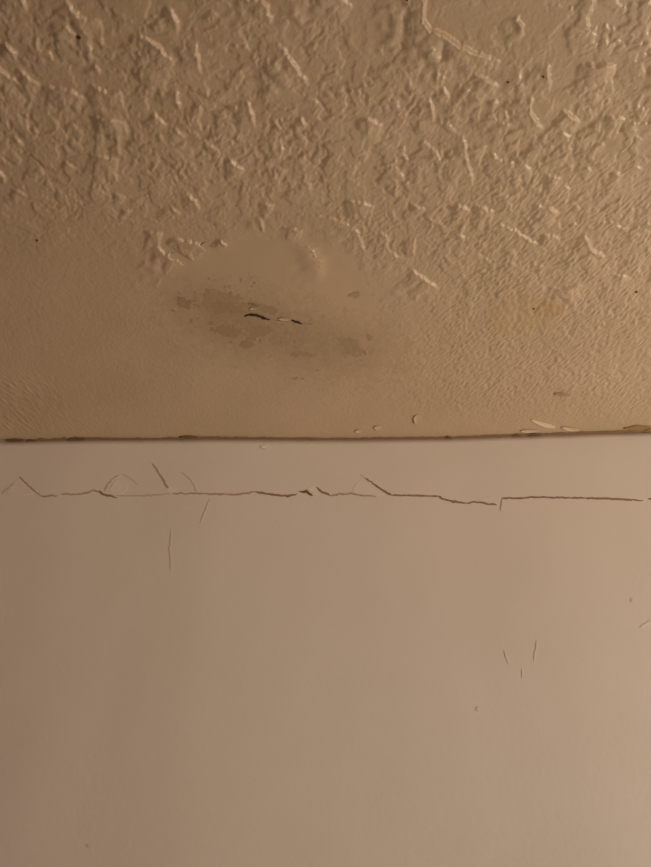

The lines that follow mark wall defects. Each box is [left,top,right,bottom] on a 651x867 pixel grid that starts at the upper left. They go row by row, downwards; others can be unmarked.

crack [245,303,270,320]
water stain [140,259,447,405]
crack [0,430,646,442]
crack [2,463,651,523]